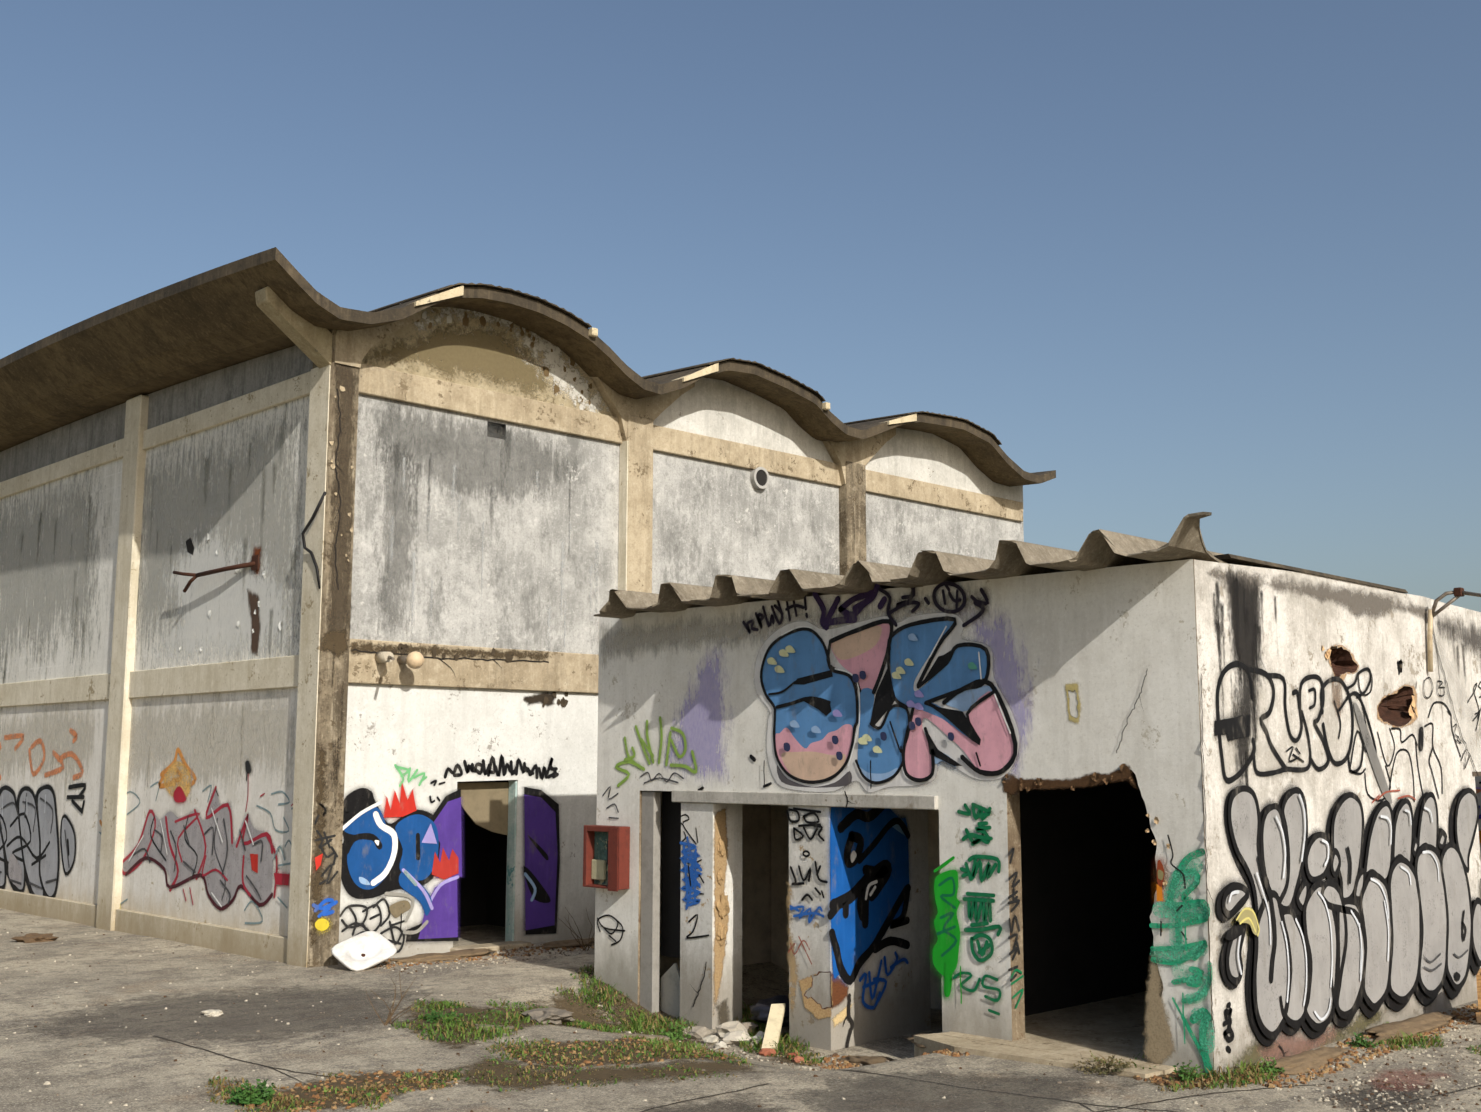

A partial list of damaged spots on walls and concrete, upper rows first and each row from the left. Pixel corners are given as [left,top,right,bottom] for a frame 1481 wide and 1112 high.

water stain [327,325,547,807]
spalling [1322,645,1359,711]
water stain [1210,570,1481,786]
spalling [1377,660,1418,728]
spalling [1002,764,1136,795]